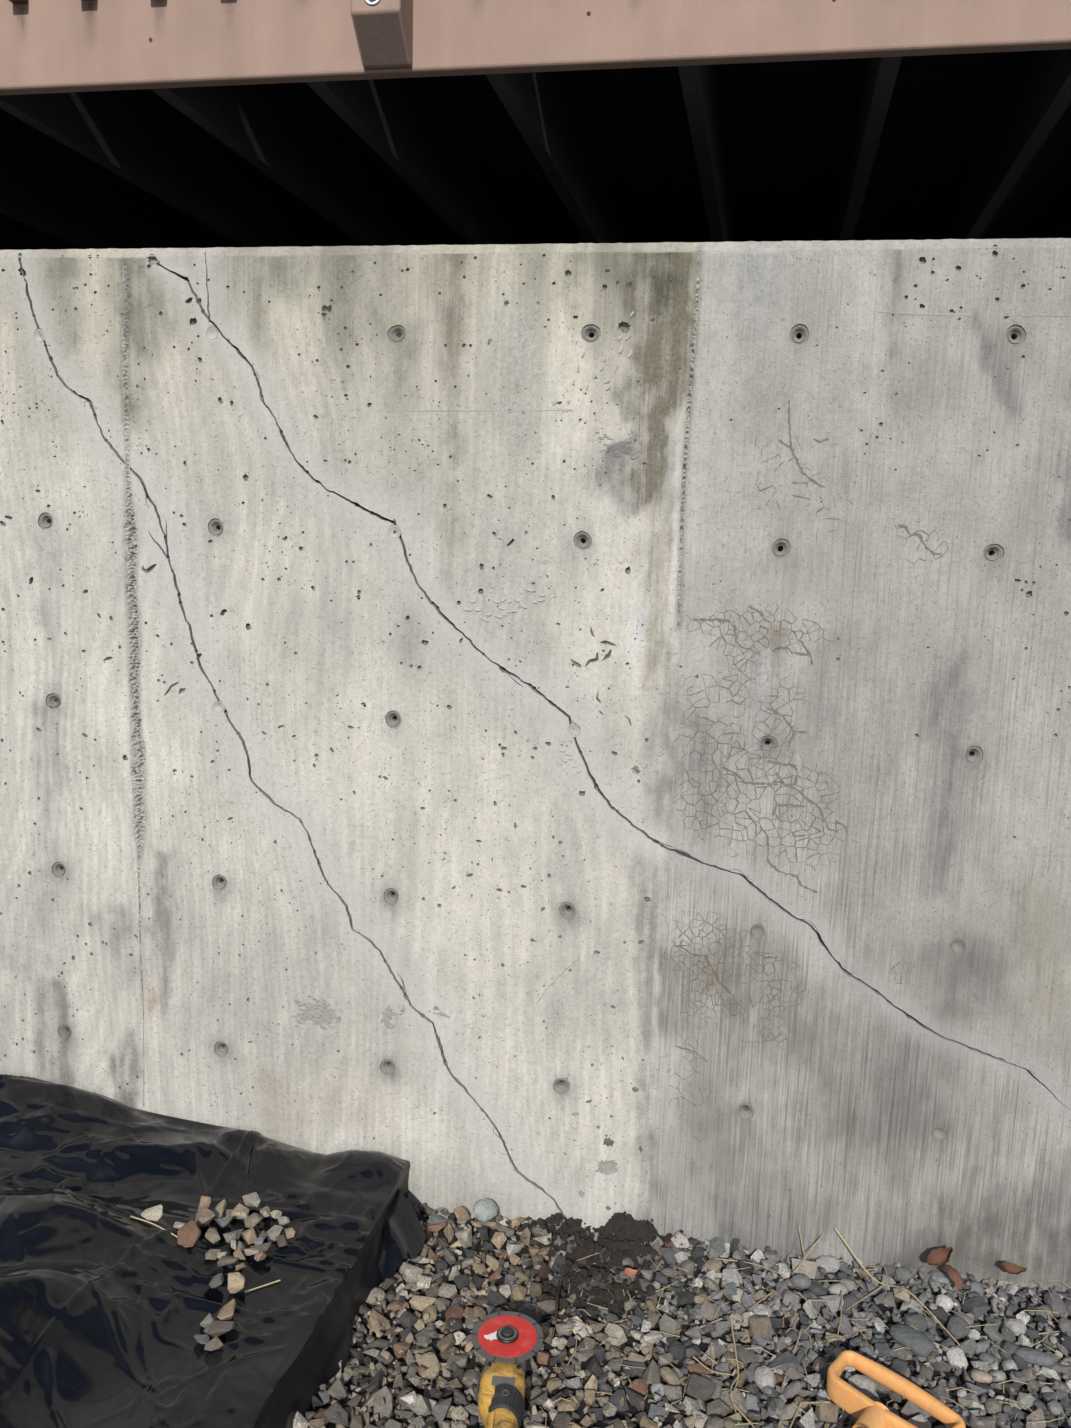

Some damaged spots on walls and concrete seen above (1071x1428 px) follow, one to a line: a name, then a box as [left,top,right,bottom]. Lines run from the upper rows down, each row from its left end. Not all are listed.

crack [18,252,566,1218]
crack [156,251,1069,1143]
water stain [606,252,694,507]